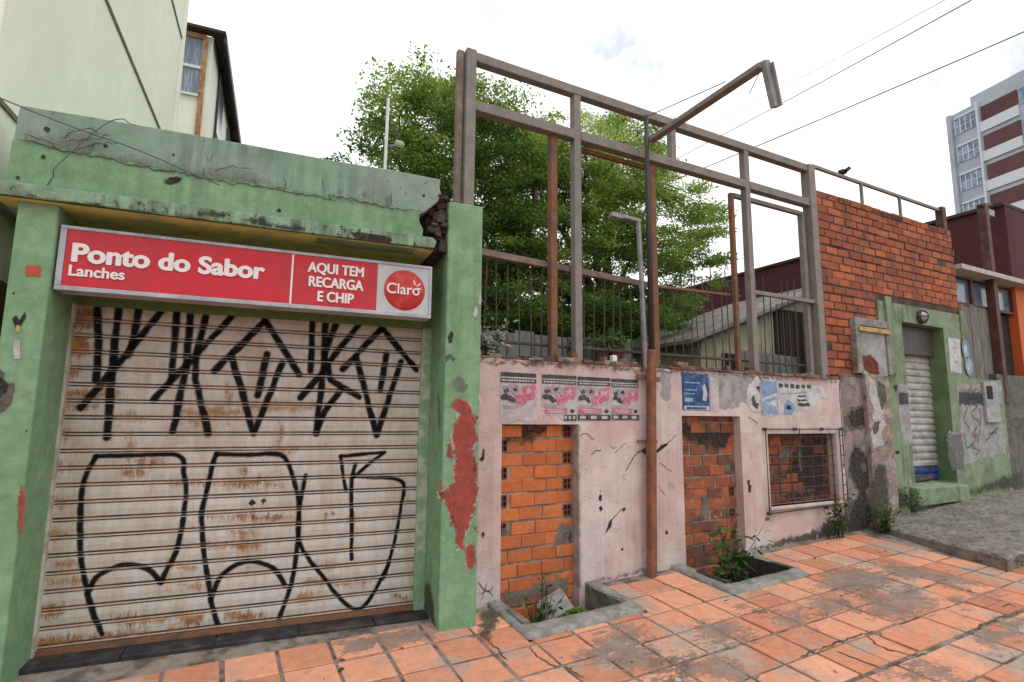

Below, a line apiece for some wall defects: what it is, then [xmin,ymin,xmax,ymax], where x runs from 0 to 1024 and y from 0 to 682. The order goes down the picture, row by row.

crack [19,128,423,212]
spalling [424,188,449,255]
rust [66,307,118,410]
flaking render [0,370,14,413]
peeling [437,396,485,571]
crack [580,433,671,493]
leakage [868,465,911,528]
leakage [970,470,1024,495]
rust [207,512,284,550]
rust [41,604,63,620]
rust [37,611,266,649]
rust [297,564,372,604]